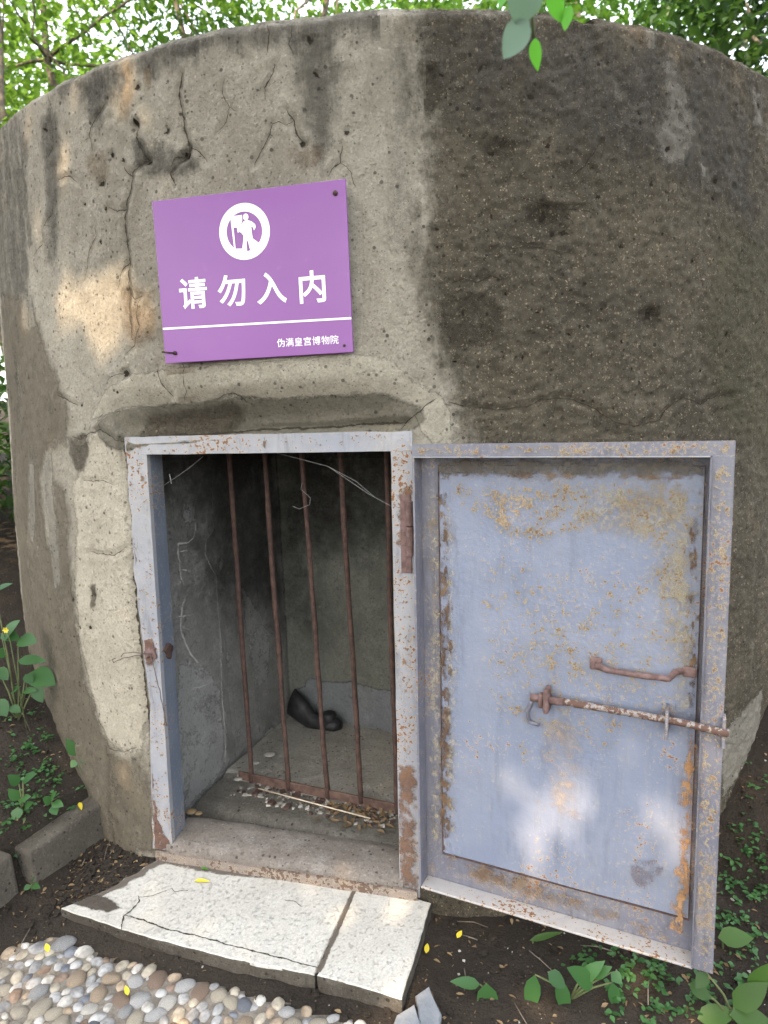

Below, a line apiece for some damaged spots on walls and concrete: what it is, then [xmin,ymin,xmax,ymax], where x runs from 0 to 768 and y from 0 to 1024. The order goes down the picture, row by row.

crack [255,111,306,163]
crack [85,75,205,381]
water stain [405,9,768,729]
crack [168,394,735,436]
rust [142,617,158,692]
rust [417,443,732,952]
rust [152,772,170,850]
rust [398,746,419,888]
water stain [720,758,743,814]
crack [121,889,318,968]
water stain [418,887,507,918]